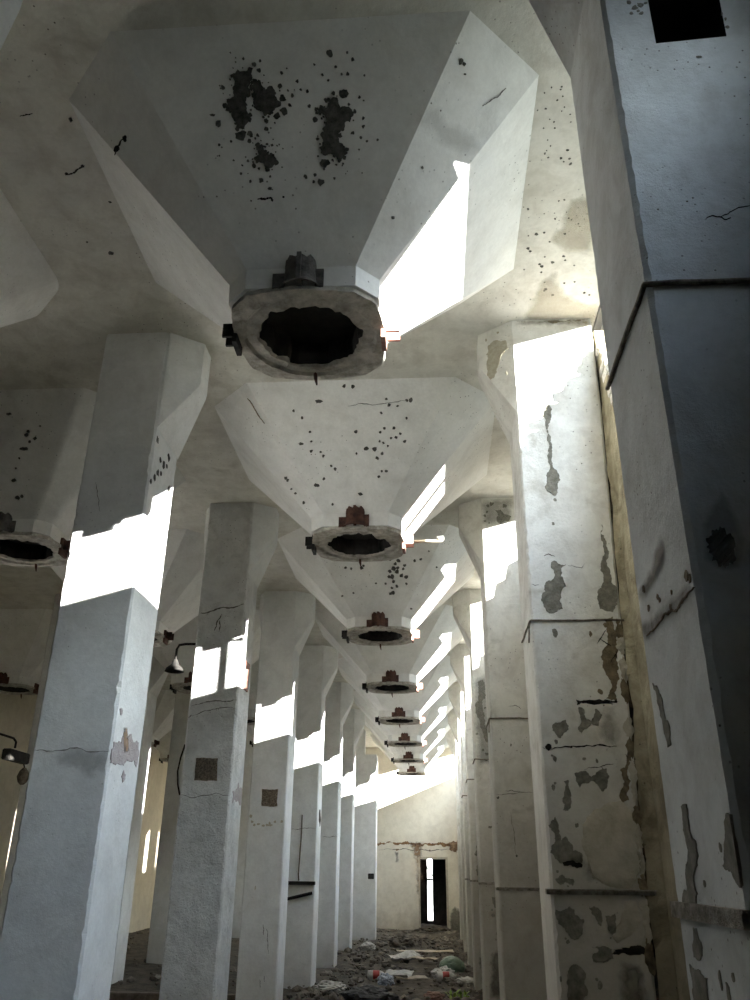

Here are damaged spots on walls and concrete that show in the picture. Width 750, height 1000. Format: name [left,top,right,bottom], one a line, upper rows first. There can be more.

peeling [210,52,379,190]
crack [705,205,750,220]
peeling [485,331,508,380]
peeling [527,400,560,501]
peeling [541,561,566,614]
crack [190,700,233,717]
spalling [551,526,630,762]
crack [544,368,694,1000]
spalling [377,841,458,852]
peeling [548,757,609,887]
peeling [681,804,706,904]
peeling [719,813,744,888]